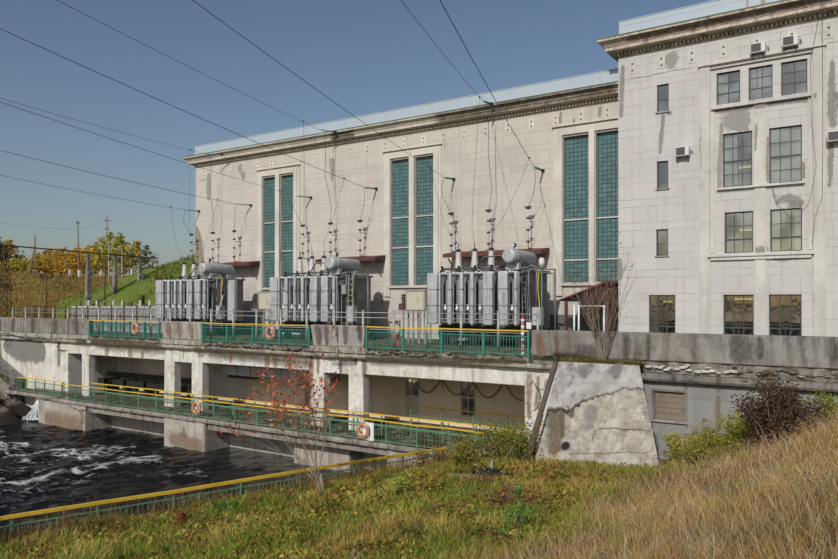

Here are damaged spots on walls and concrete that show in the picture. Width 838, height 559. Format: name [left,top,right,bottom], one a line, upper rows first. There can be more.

leakage [827,62,838,127]
leakage [716,94,816,188]
leakage [776,194,803,209]
crack [529,373,652,460]